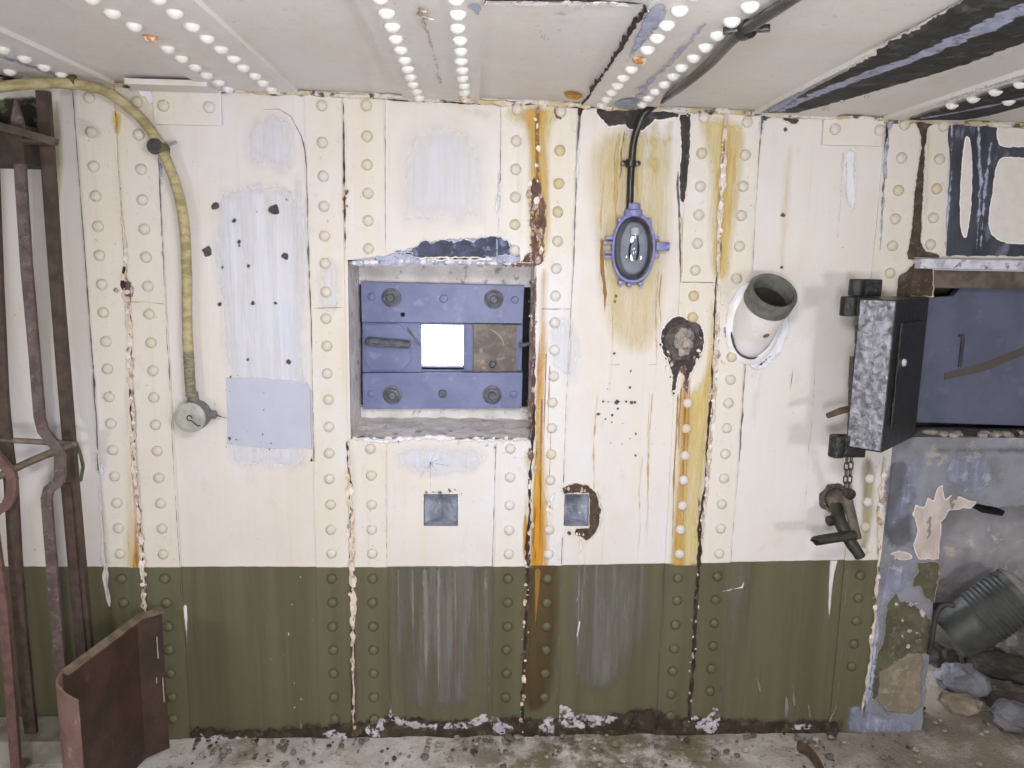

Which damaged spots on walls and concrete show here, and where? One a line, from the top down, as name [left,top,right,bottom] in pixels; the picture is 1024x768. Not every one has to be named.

peeling [350,235,520,266]
rust [503,108,552,267]
rust [600,132,663,329]
peeling [896,78,1024,297]
crack [345,441,357,738]
rust [524,280,556,708]
crack [468,0,665,737]
peeling [650,301,705,403]
crack [686,113,728,722]
water stain [365,710,513,738]
water stain [538,703,617,734]
water stain [693,708,720,734]